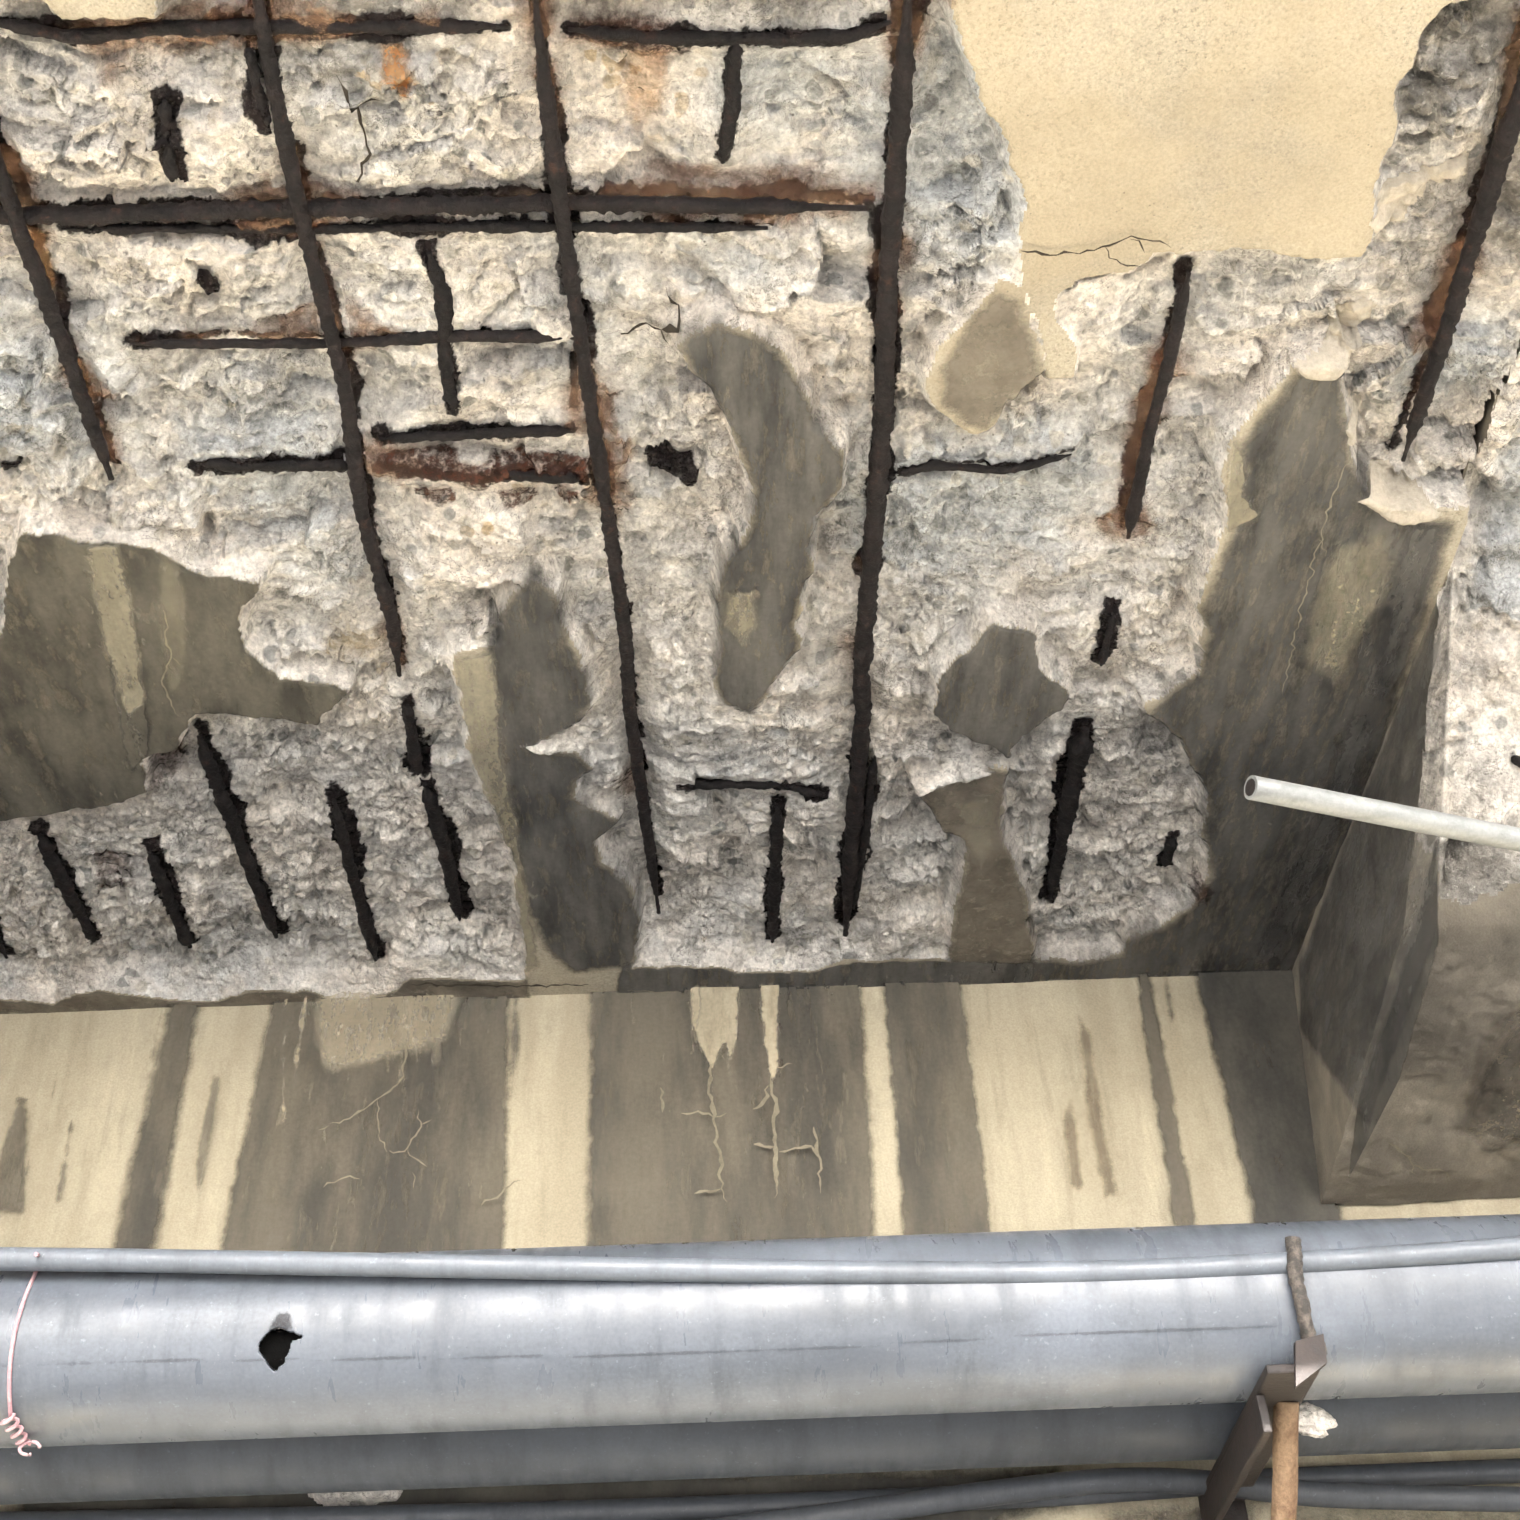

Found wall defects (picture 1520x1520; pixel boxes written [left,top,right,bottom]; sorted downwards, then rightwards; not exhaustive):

corrosion [0,0,890,665]
spalling [0,0,1520,1004]
crack [1021,235,1170,267]
corrosion [1096,256,1194,539]
corrosion [1385,16,1520,451]
corrosion [27,818,200,945]
corrosion [149,718,289,935]
corrosion [324,781,386,962]
corrosion [400,693,474,919]
leakage [0,323,1453,1253]
corrosion [760,780,830,940]
crack [660,1063,823,1202]